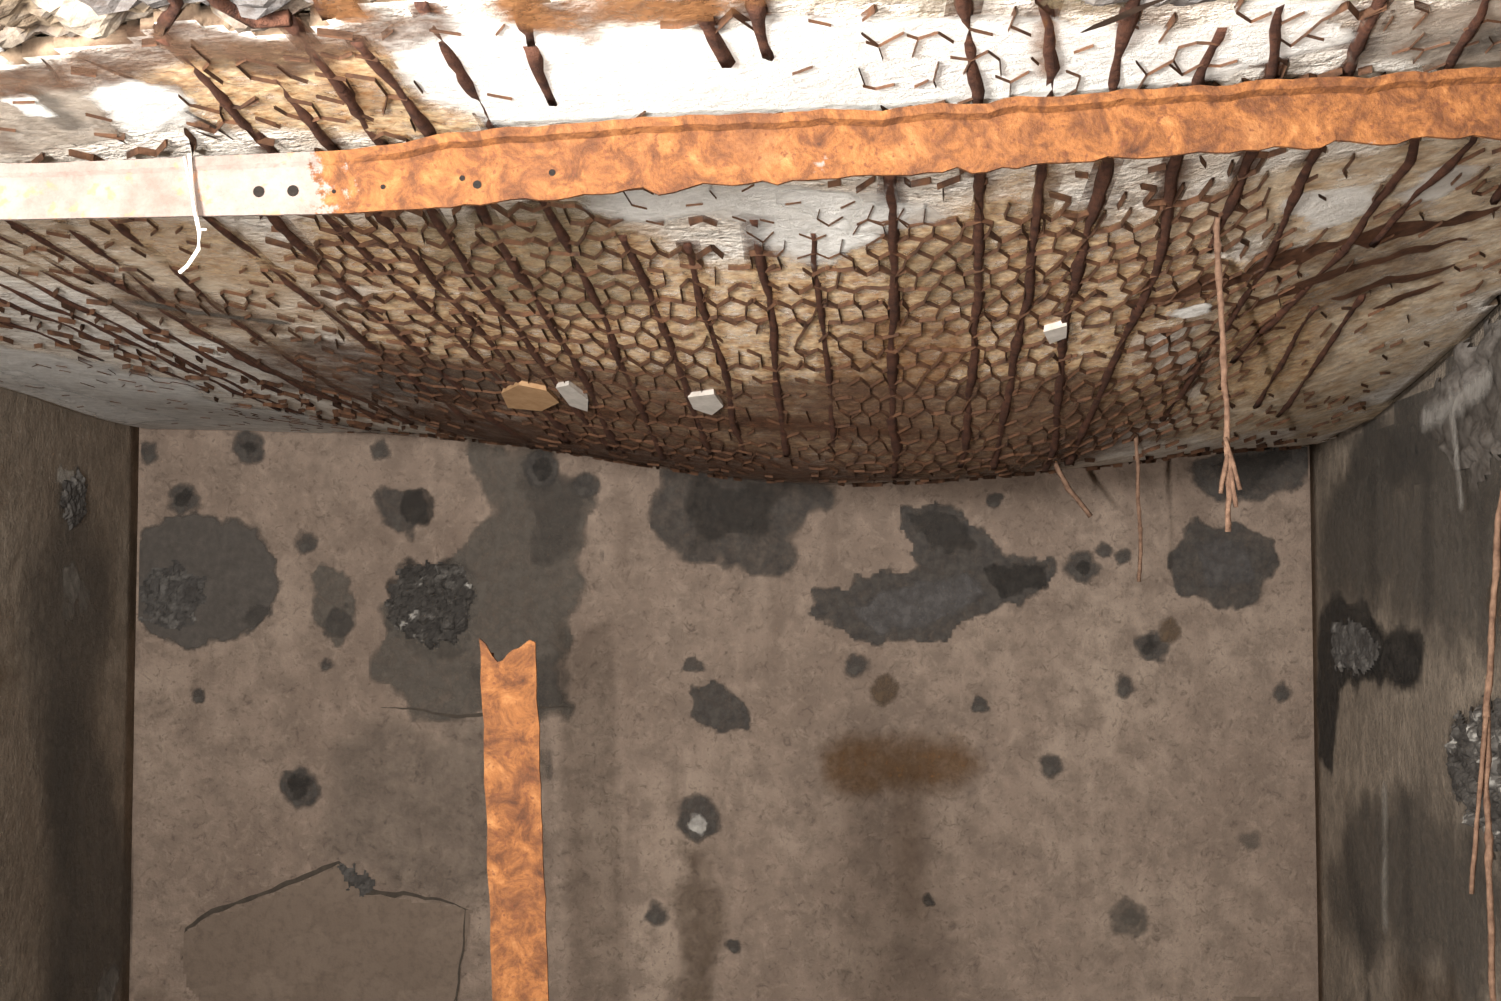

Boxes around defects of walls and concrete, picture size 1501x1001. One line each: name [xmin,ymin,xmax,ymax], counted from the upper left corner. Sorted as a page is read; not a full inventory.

flaking render [1,95,55,118]
flaking render [89,79,193,132]
spalling [0,0,376,66]
flaking render [383,0,1351,123]
flaking render [598,182,924,261]
flaking render [0,347,448,440]
spalling [1423,315,1501,502]
spalling [384,559,477,658]
spalling [1444,694,1501,860]
crack [454,909,466,1001]